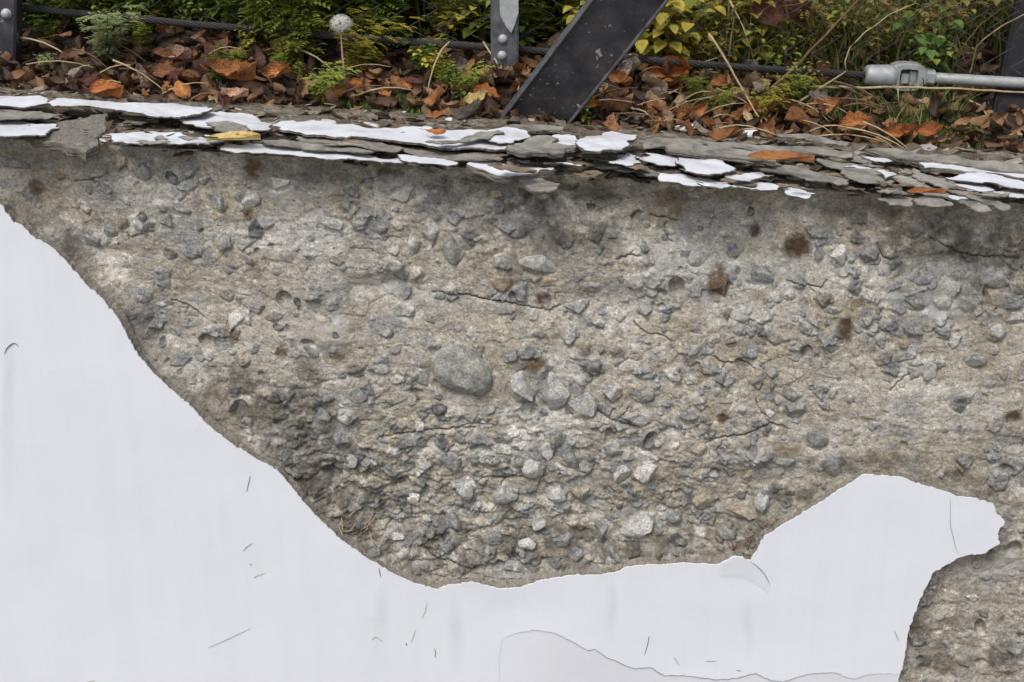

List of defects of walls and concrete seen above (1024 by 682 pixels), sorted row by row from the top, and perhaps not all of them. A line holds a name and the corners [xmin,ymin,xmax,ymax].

peeling [219,120,564,167]
peeling [775,133,849,148]
corrosion [784,235,810,257]
corrosion [709,267,727,294]
crack [433,291,556,310]
spalling [0,138,1024,682]